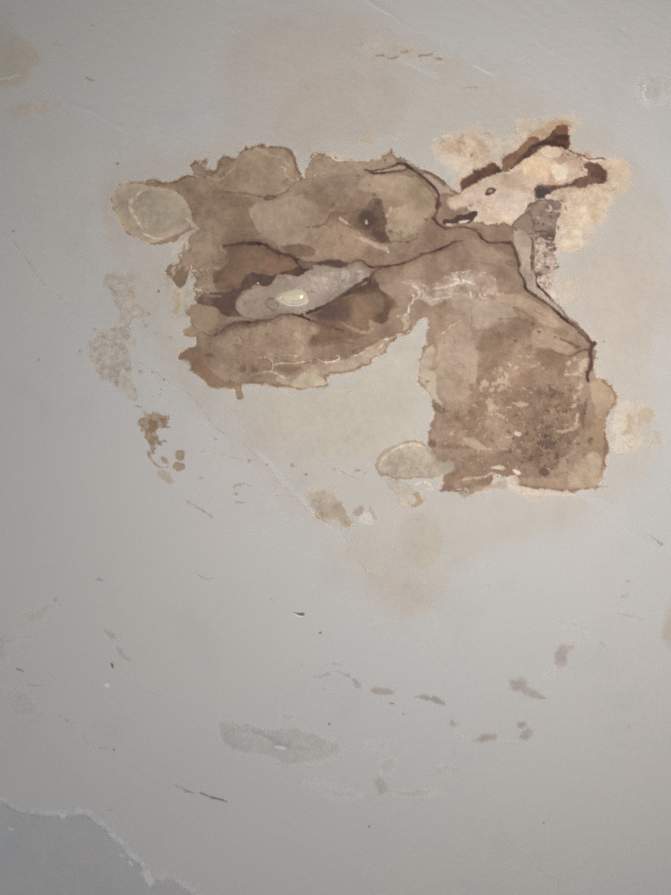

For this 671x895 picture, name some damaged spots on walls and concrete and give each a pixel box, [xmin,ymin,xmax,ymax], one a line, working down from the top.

damp [78,271,145,400]
damp [111,144,661,508]
crack [204,162,604,382]
flaking render [534,237,559,297]